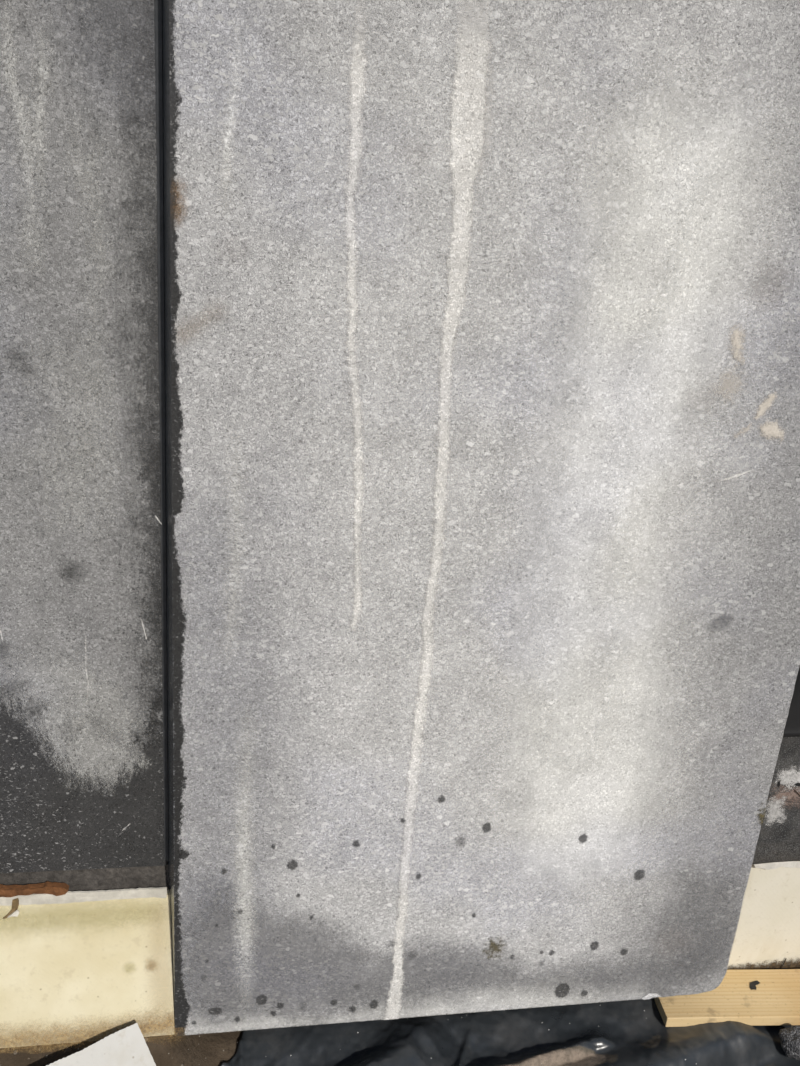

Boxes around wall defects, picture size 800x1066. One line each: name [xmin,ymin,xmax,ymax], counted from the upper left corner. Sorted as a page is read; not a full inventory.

damp [0,0,166,874]
damp [169,0,748,1037]